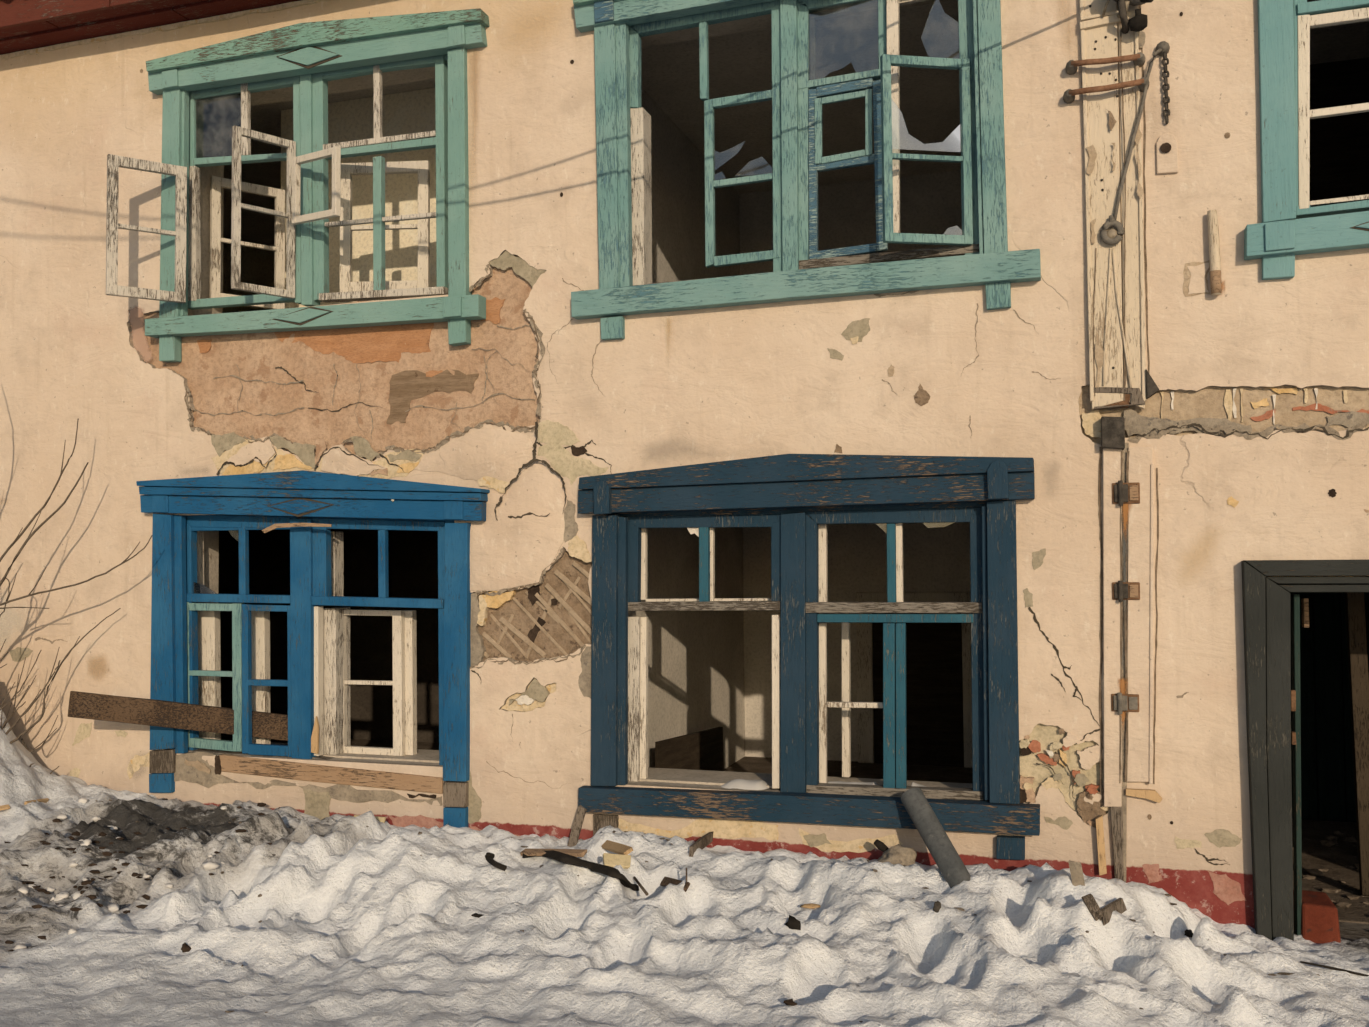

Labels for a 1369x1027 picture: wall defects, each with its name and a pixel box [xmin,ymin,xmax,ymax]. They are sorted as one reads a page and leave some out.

peeling [1183,260,1211,297]
peeling [827,318,870,361]
spalling [1078,385,1369,445]
spalling [131,251,609,712]
crack [494,422,612,521]
crack [1028,607,1100,741]
spalling [1019,723,1110,830]